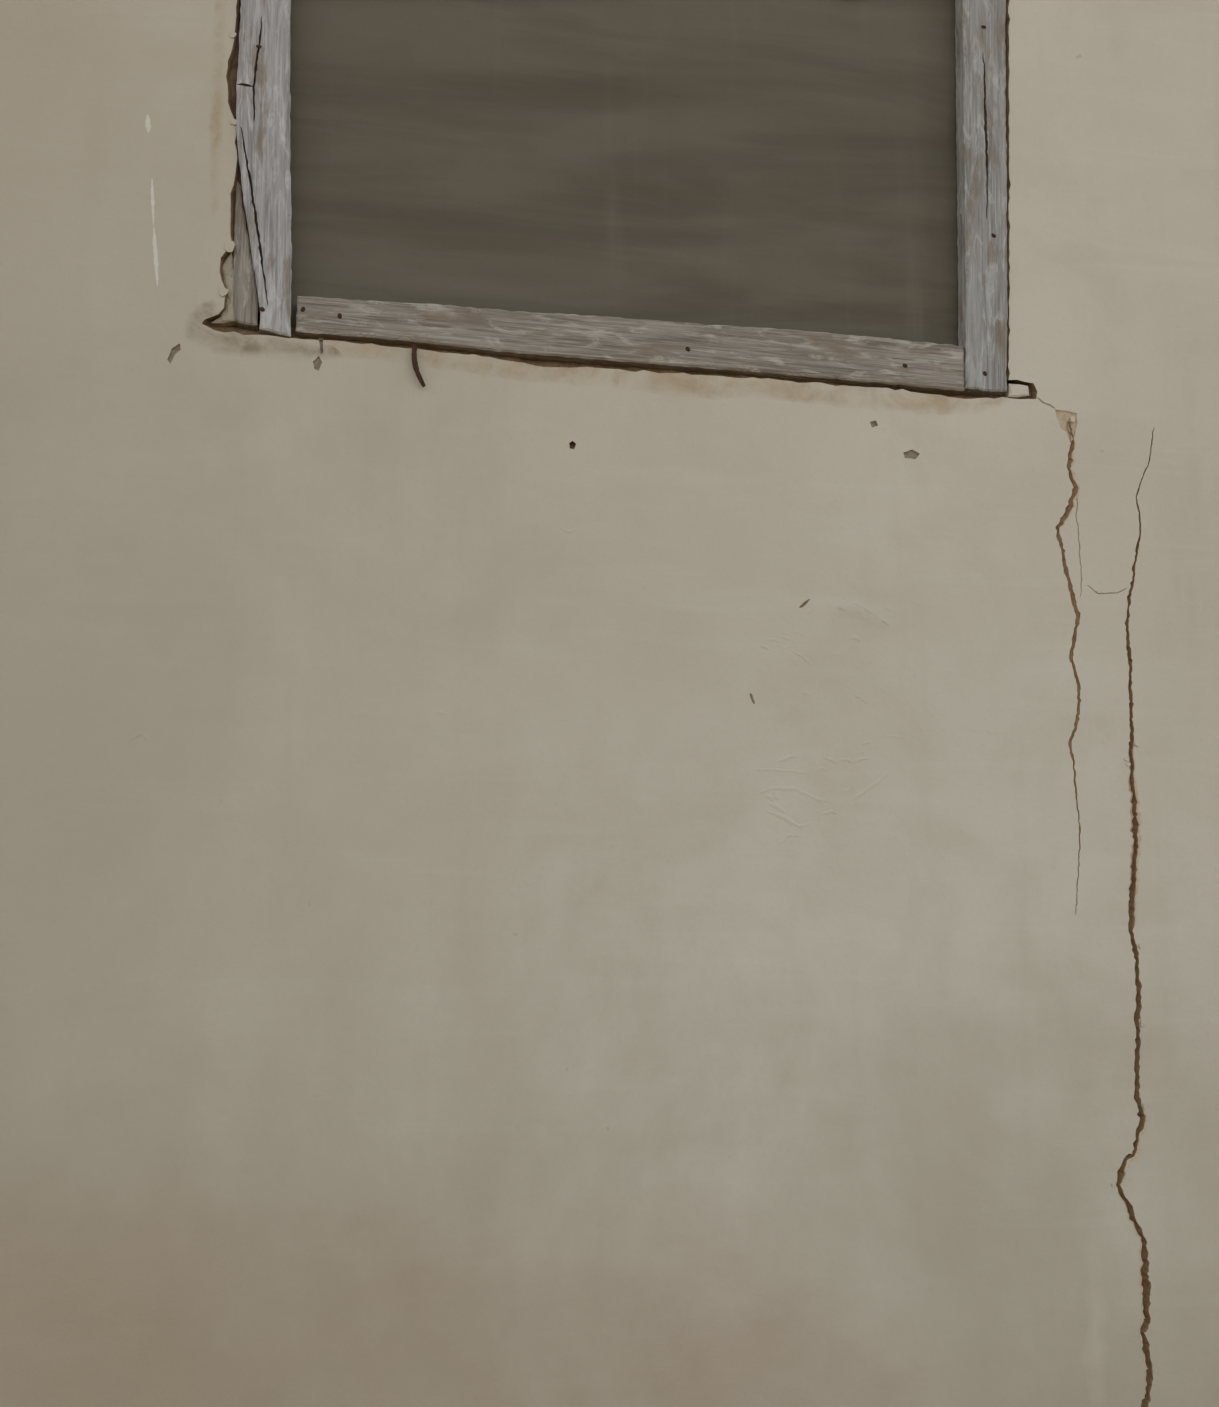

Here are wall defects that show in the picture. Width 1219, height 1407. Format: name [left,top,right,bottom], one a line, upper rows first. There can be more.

spalling [202,0,266,335]
spalling [291,0,1037,399]
crack [1037,397,1154,1407]